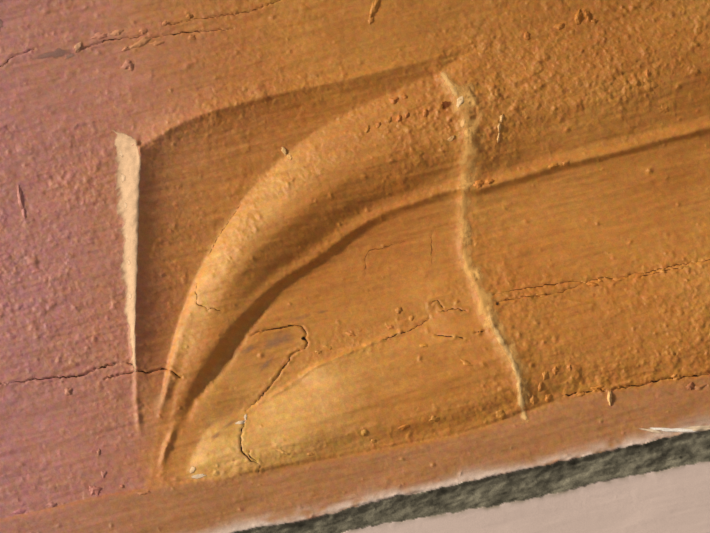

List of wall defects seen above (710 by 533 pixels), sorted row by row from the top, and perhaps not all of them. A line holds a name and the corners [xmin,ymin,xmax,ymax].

crack [102,0,280,43]
crack [497,259,710,302]
crack [385,300,466,340]
crack [3,363,181,385]
crack [240,325,308,472]
crack [562,374,709,396]